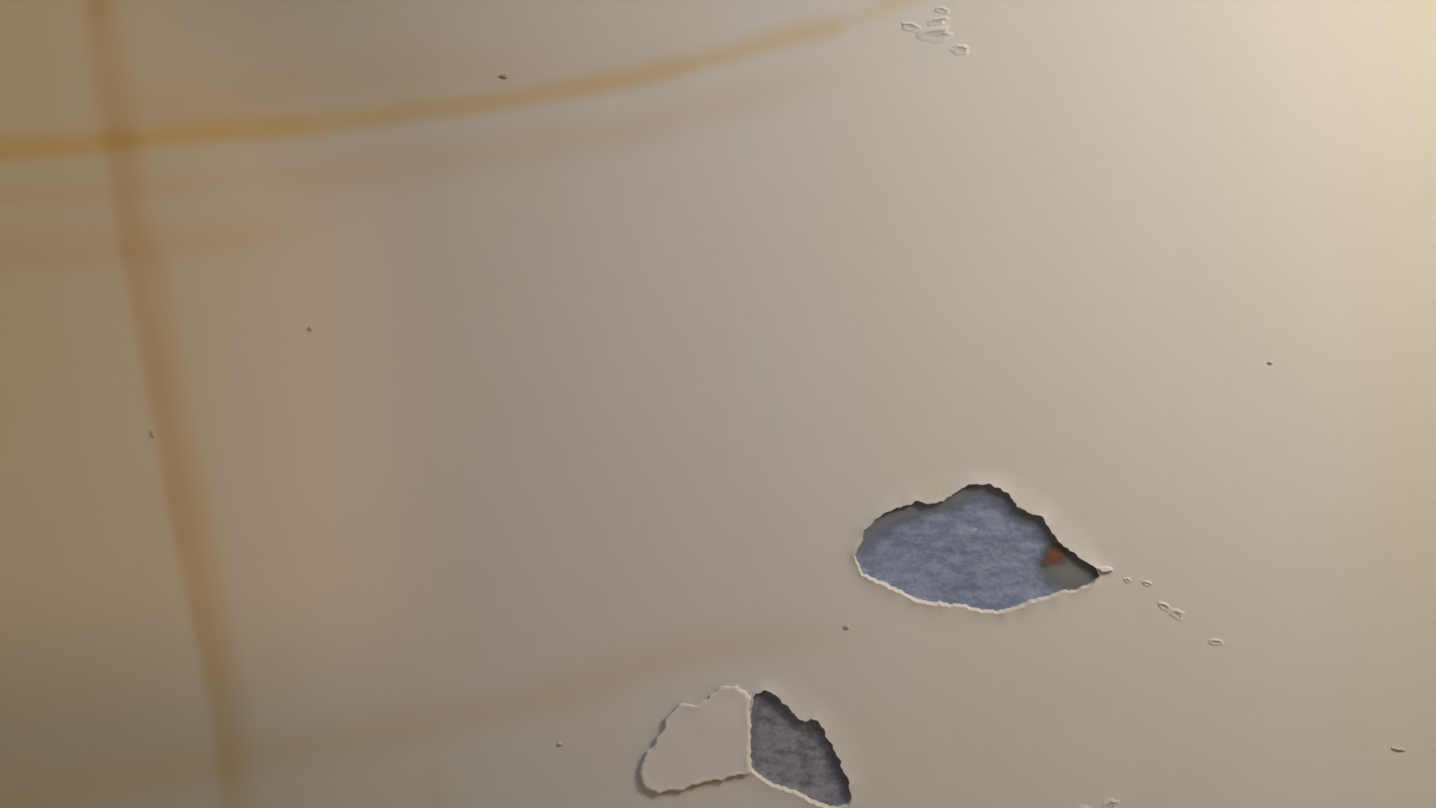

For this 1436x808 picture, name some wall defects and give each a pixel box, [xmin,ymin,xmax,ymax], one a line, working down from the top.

peeling [840,463,1186,637]
peeling [639,670,875,808]